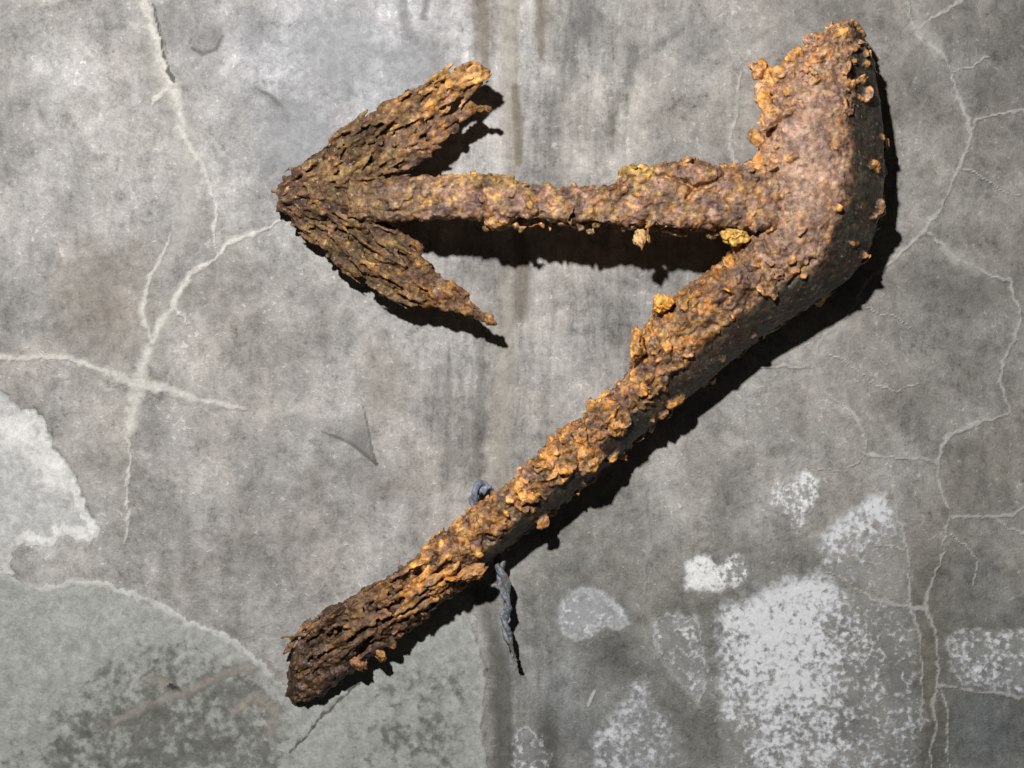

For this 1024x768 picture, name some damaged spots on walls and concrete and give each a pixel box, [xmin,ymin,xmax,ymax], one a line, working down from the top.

crack [0,0,282,541]
rust [565,220,595,235]
rust [626,224,688,251]
rust [706,227,751,268]
crack [760,0,1024,767]
leakage [770,469,821,527]
rust [440,563,489,595]
leakage [558,587,629,641]
leakage [653,492,921,768]
rust [350,648,387,672]
leakage [945,628,1024,693]
leakage [593,683,675,768]